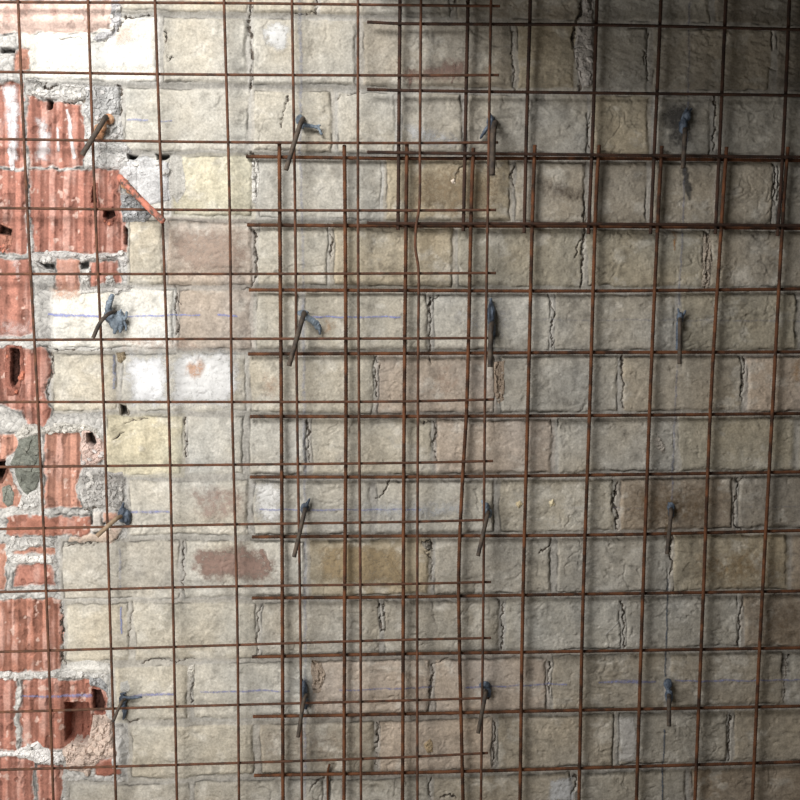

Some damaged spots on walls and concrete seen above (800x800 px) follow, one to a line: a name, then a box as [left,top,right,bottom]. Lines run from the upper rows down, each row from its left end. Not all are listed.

crack [571,0,583,91]
spalling [489,0,800,236]
crack [771,164,779,202]
crack [574,202,586,286]
spalling [0,0,500,800]
crack [611,483,619,530]
spalling [483,225,800,800]
crack [732,476,744,530]
crack [378,603,386,631]